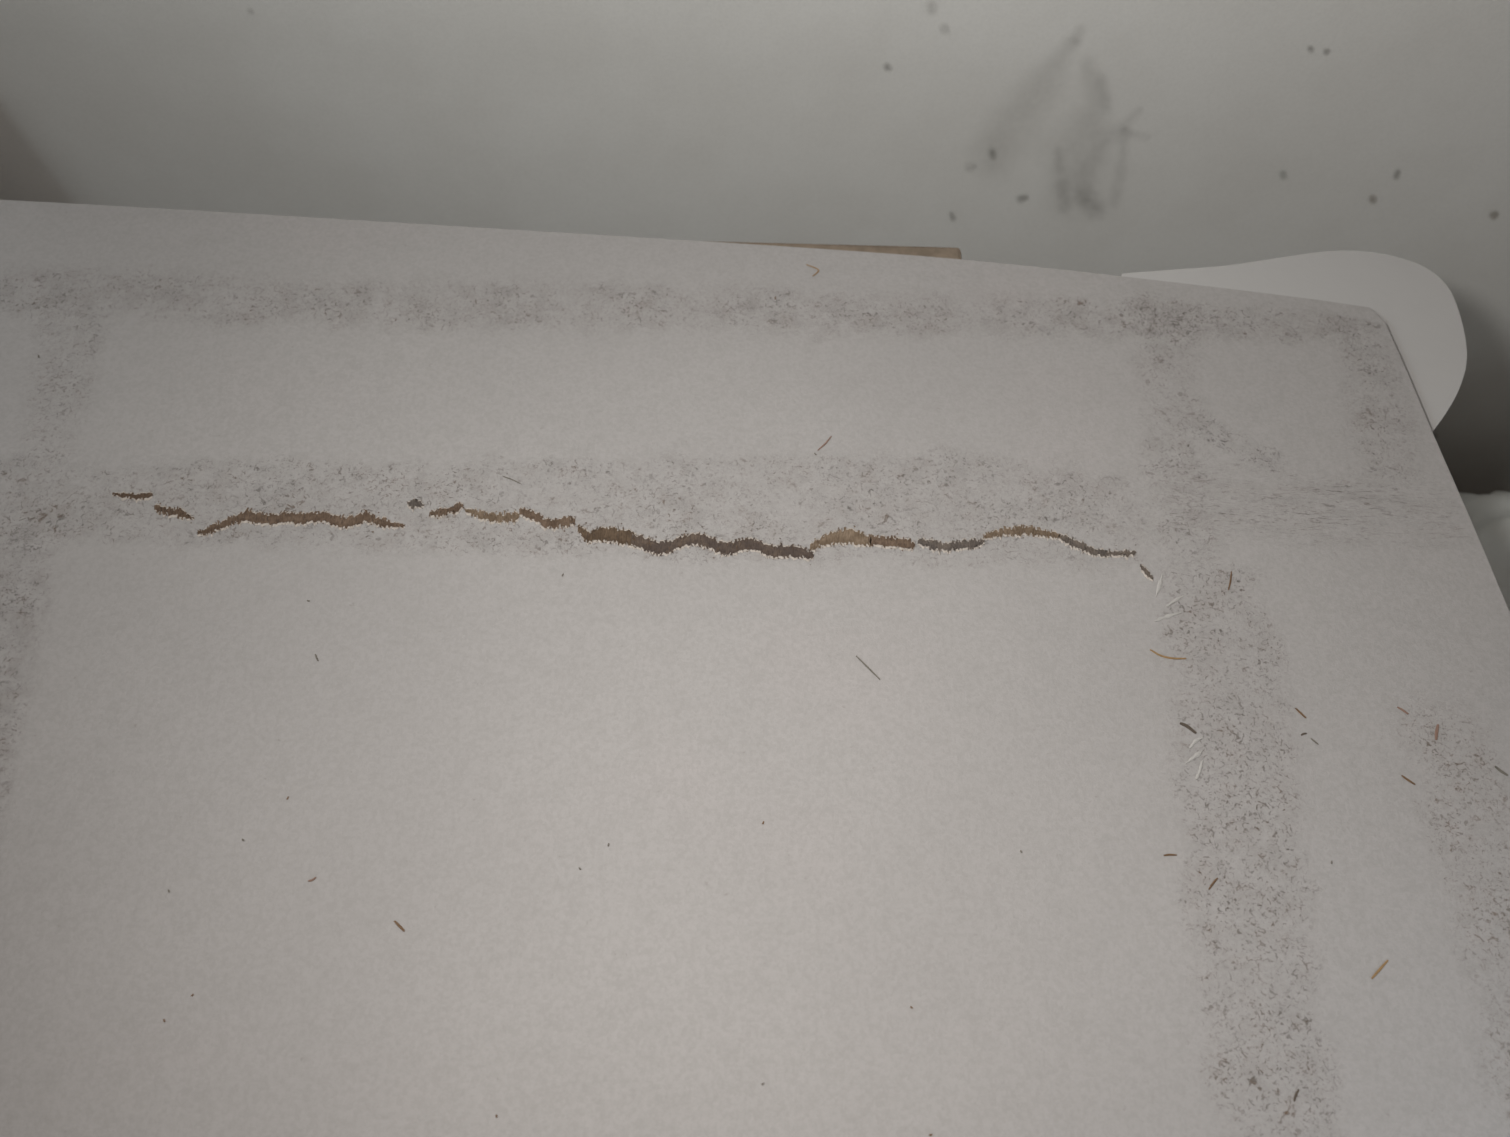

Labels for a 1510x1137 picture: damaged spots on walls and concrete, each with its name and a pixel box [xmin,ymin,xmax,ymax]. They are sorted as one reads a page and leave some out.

crack [112,491,1153,581]